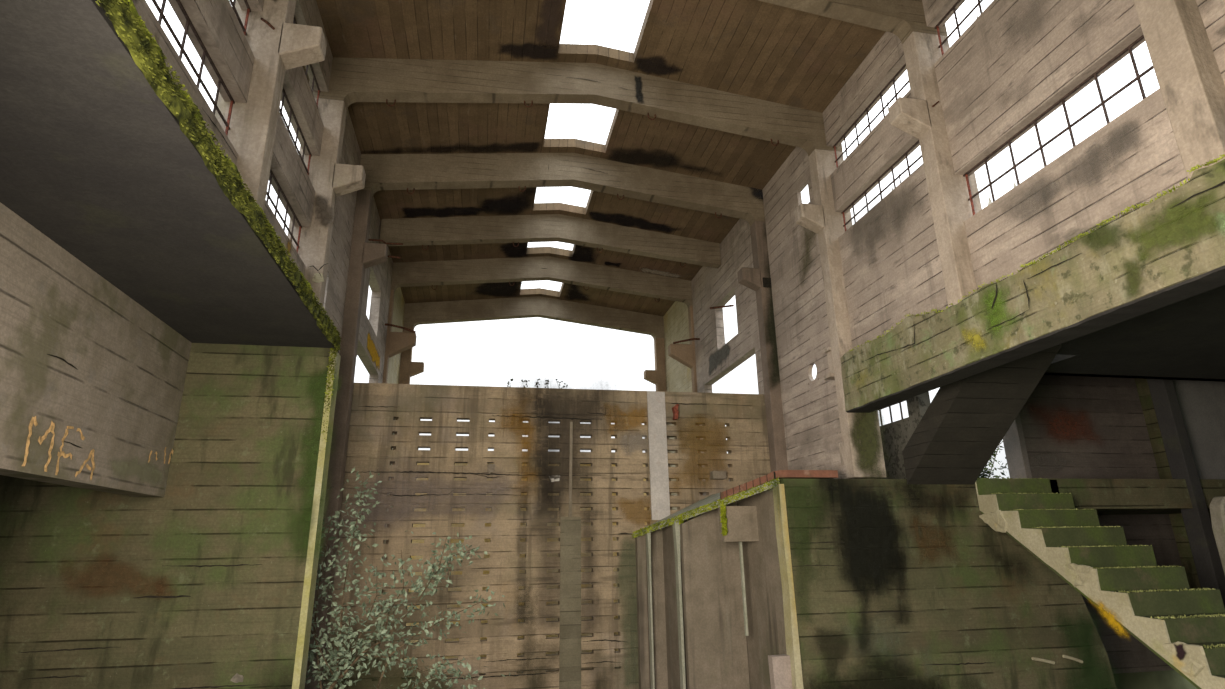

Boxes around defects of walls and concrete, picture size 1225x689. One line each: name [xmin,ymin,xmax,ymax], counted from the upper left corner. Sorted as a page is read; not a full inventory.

damp [523,382,603,499]
damp [820,473,904,595]